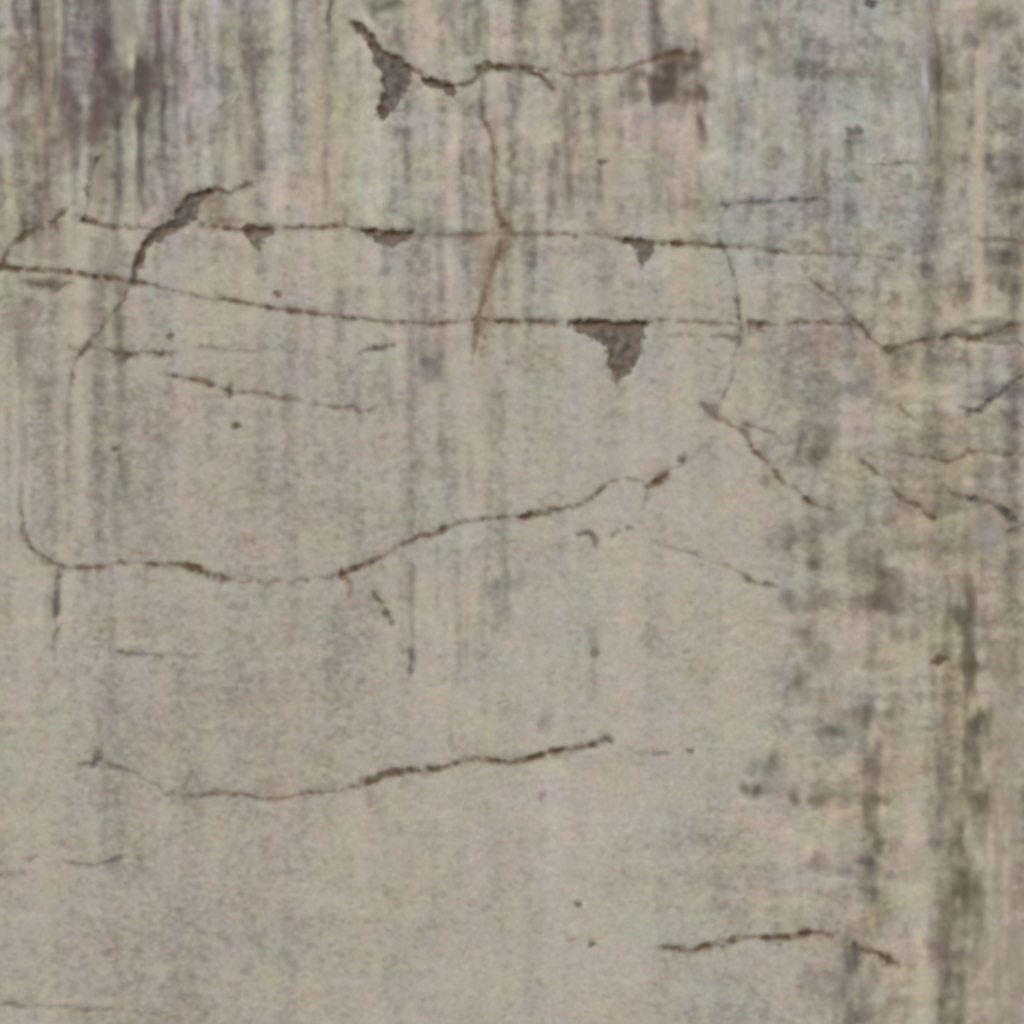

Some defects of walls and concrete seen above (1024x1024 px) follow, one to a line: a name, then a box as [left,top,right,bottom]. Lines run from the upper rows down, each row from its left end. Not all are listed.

spalling [350,20,456,120]
crack [404,61,554,90]
water stain [654,64,676,98]
water stain [920,57,930,106]
water stain [135,57,157,187]
crack [0,189,158,287]
spalling [365,228,414,247]
spalling [627,239,654,265]
spalling [569,319,647,382]
crack [487,737,612,764]
crack [351,762,459,788]
crack [661,929,822,952]